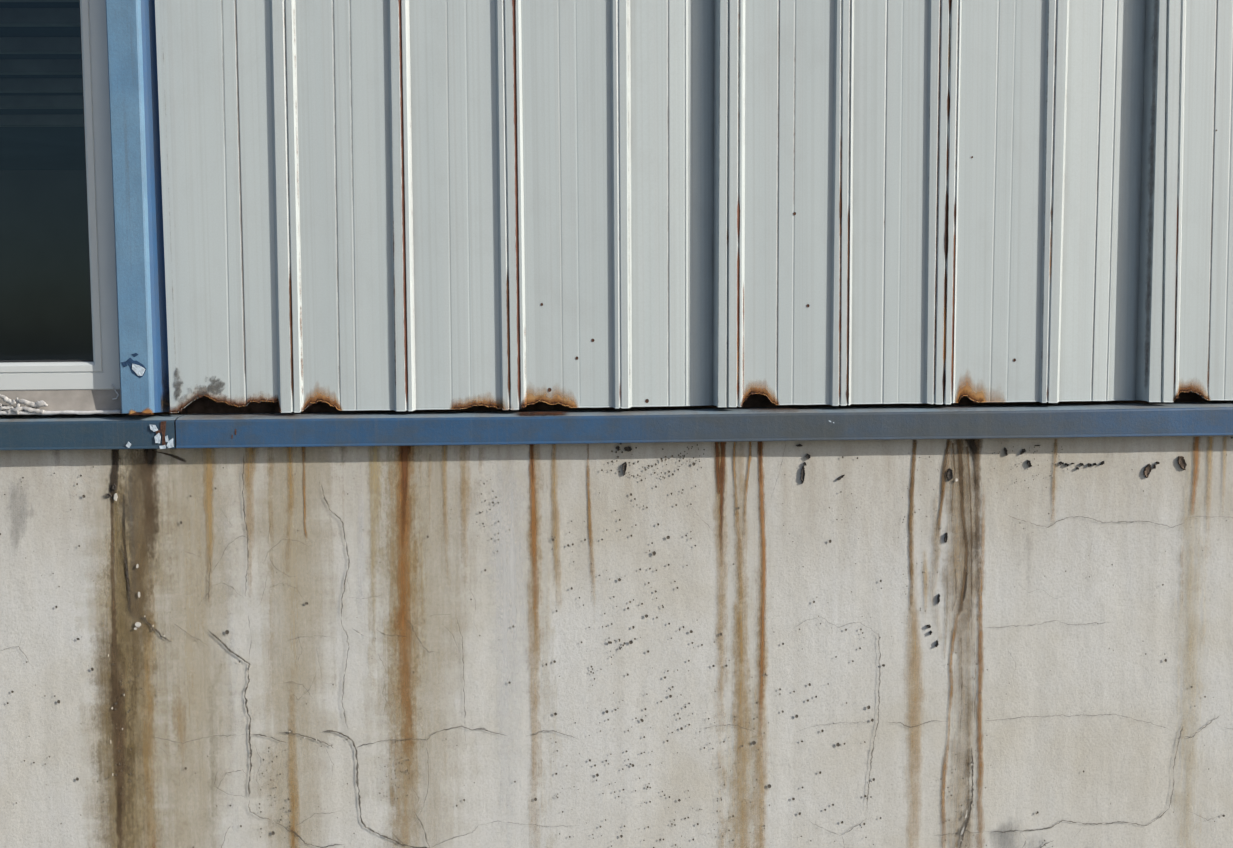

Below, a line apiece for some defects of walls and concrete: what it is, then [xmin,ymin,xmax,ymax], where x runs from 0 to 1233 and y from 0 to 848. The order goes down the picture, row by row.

corrosion [170,274,342,413]
corrosion [451,0,577,416]
corrosion [727,200,779,406]
corrosion [934,0,993,403]
corrosion [1173,203,1209,401]
leakage [99,449,185,848]
crack [241,457,249,592]
crack [121,488,503,848]
corrosion [394,446,414,750]
corrosion [715,441,766,709]
corrosion [909,439,984,848]
crack [959,718,1217,848]